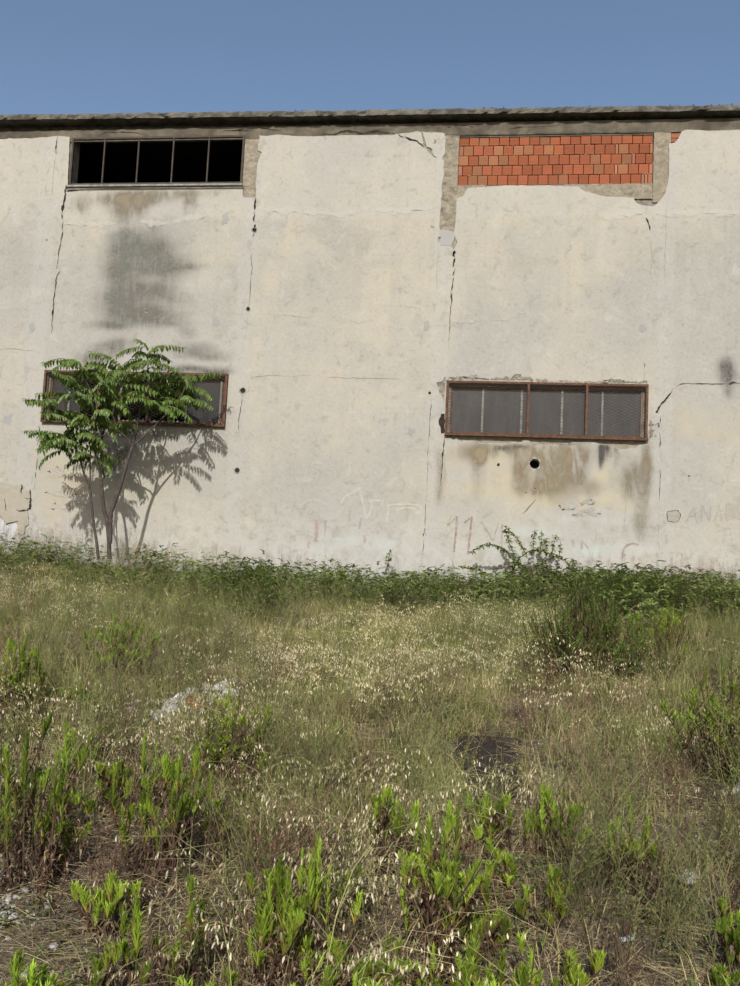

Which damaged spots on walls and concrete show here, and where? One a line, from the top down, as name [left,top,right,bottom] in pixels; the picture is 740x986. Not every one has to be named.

crack [51,137,67,332]
water stain [105,191,192,215]
spalling [422,126,515,249]
spalling [564,132,681,202]
crack [433,250,456,350]
crack [609,363,740,499]
flaking render [0,482,31,547]
water stain [290,438,677,578]